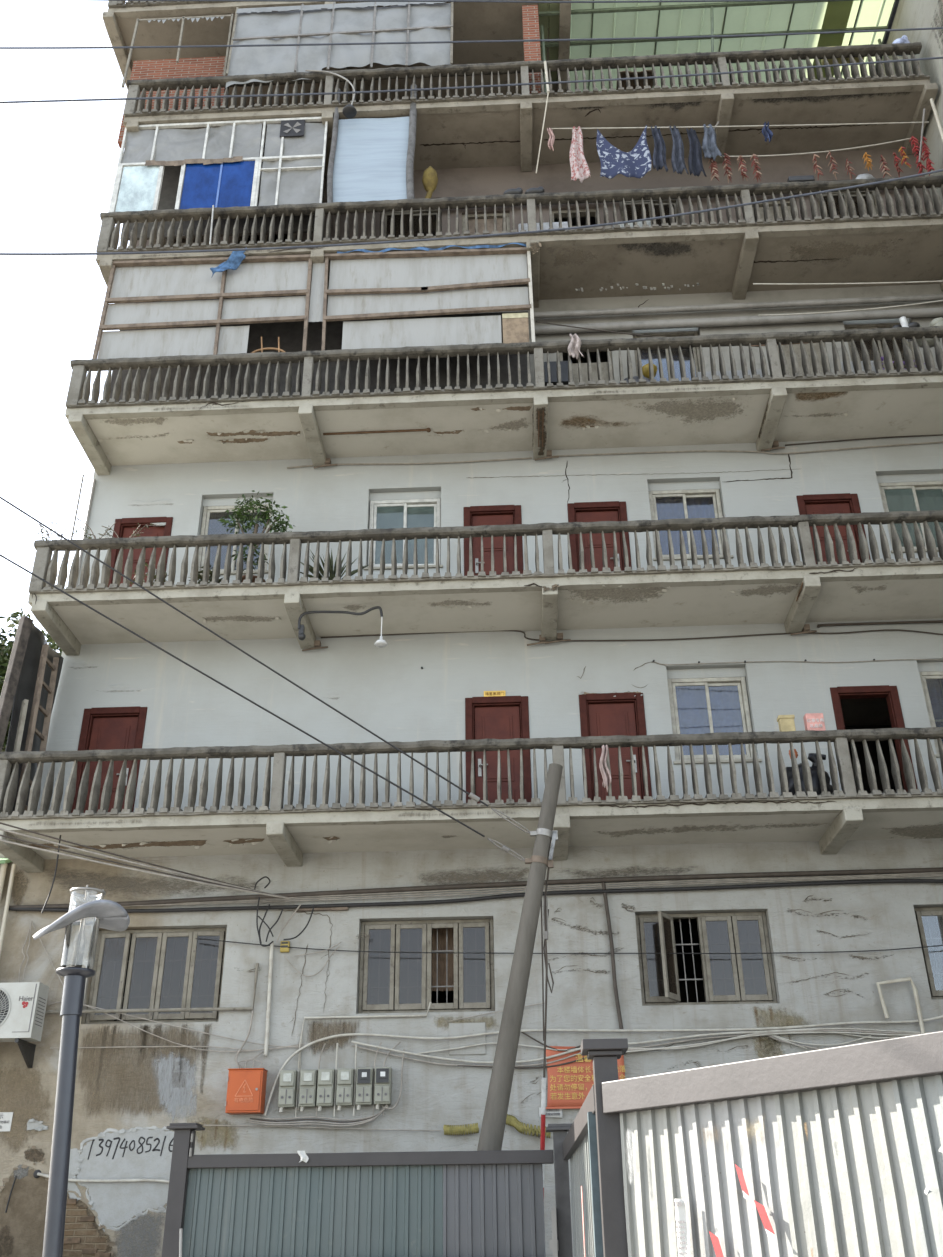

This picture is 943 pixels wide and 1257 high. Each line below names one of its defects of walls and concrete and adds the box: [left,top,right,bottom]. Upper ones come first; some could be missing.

crack [783,895,892,998]
leakage [80,1025,210,1113]
peeling [27,1119,48,1131]
flaking render [0,1146,49,1257]